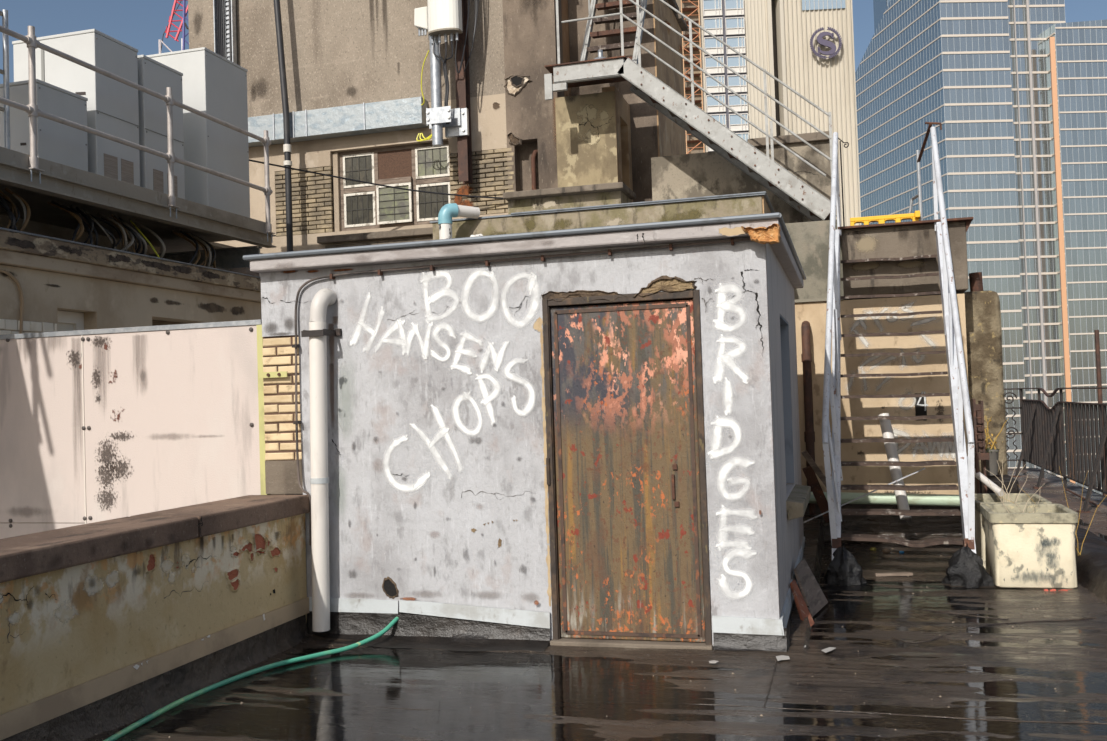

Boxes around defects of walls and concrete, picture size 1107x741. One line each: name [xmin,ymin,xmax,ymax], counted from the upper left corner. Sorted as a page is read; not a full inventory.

spalling [718,223,781,245]
leakage [198,303,244,315]
spalling [541,275,697,302]
crack [694,269,764,349]
mould [68,351,117,402]
mould [95,409,134,509]
spalling [225,532,282,593]
spalling [384,579,397,597]